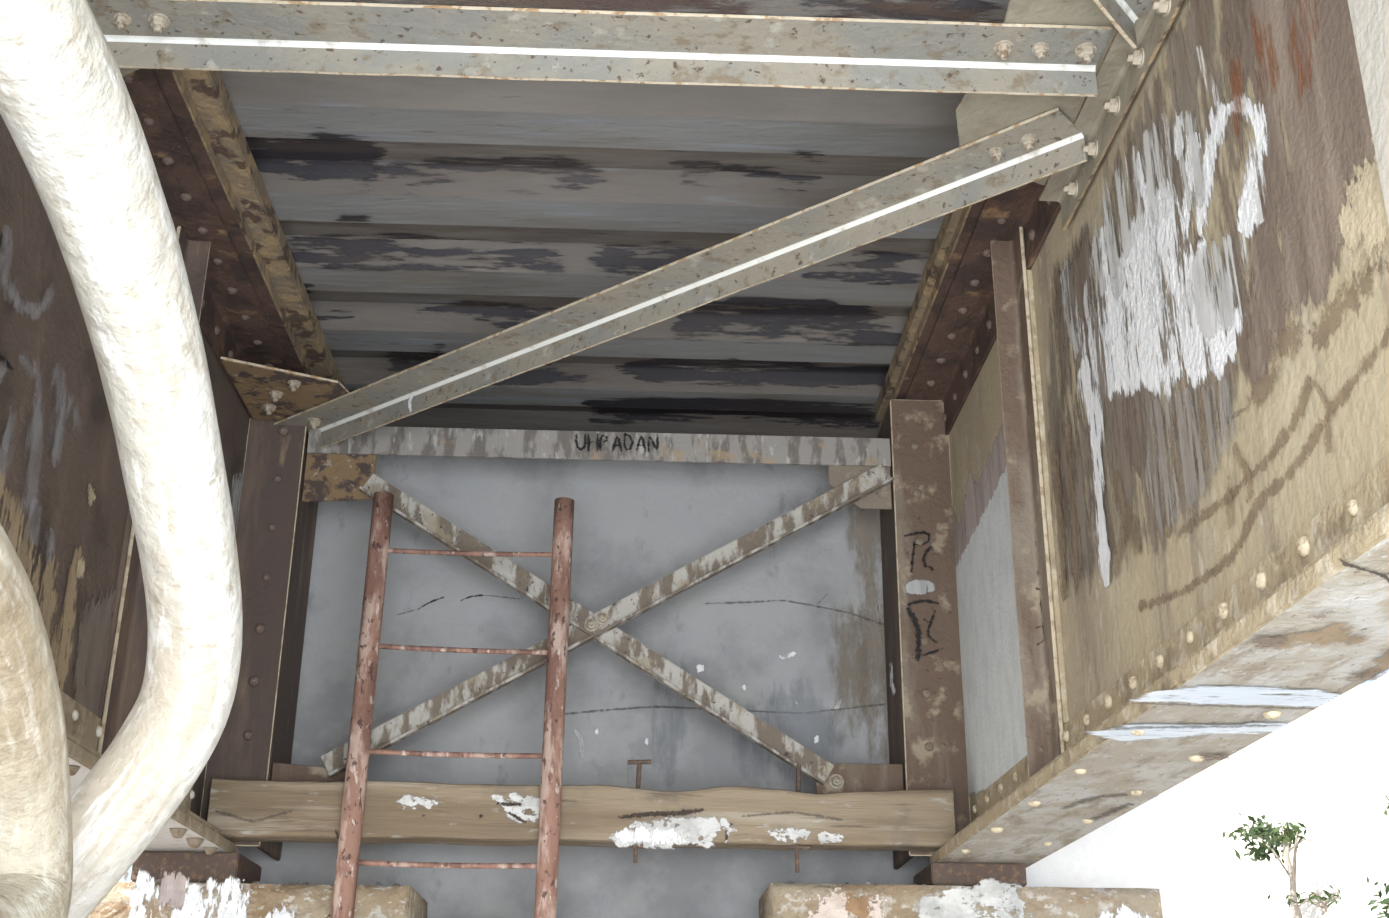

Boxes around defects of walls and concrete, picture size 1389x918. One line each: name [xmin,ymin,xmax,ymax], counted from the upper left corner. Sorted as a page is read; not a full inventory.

crack [1339,558,1389,582]
peeling [0,466,117,716]
peeling [397,795,438,809]
peeling [491,792,540,823]
peeling [609,815,737,849]
peeling [767,827,844,844]
peeling [128,867,250,918]
peeling [265,902,295,918]
peeling [801,887,888,918]
peeling [918,878,1033,918]
peeling [1099,904,1149,918]